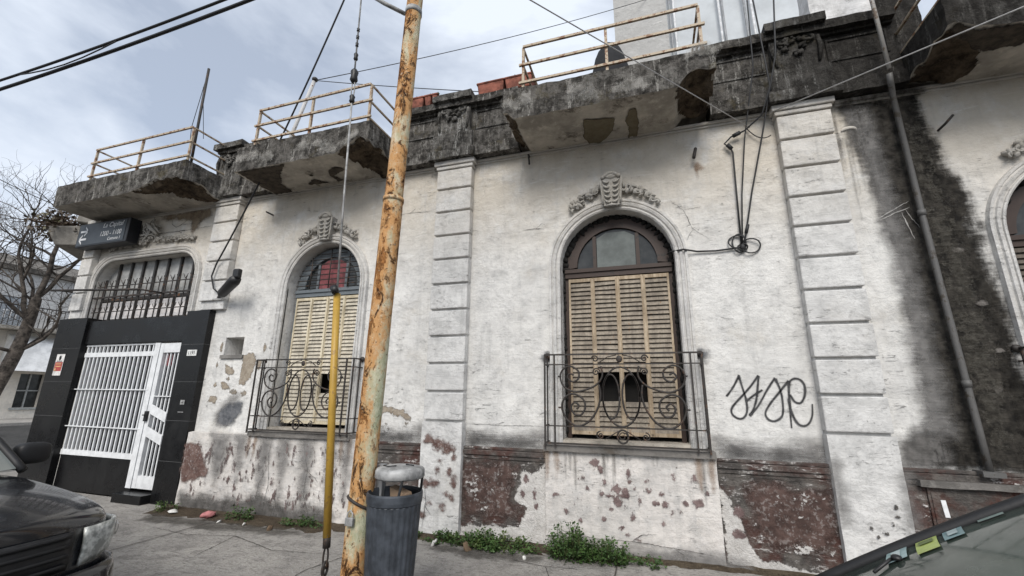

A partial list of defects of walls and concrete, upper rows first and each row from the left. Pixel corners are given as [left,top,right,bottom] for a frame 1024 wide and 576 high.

spalling [908,23,1024,84]
spalling [675,68,716,119]
peeling [583,108,639,144]
spalling [132,177,219,202]
peeling [238,164,292,195]
spalling [309,136,389,185]
water stain [839,87,1024,472]
peeling [207,343,267,404]
water stain [211,396,245,477]
peeling [180,441,348,514]
peeling [420,434,559,544]
peeling [564,458,839,574]